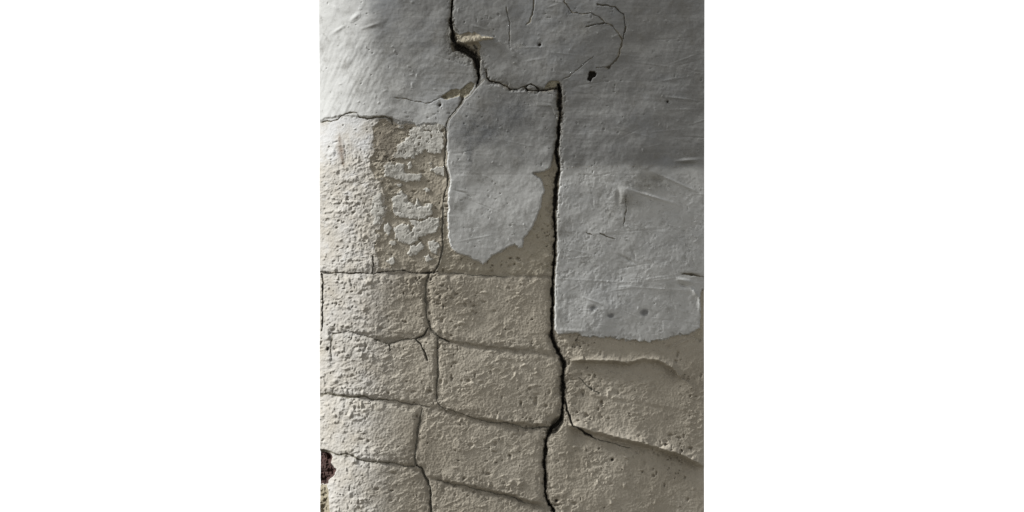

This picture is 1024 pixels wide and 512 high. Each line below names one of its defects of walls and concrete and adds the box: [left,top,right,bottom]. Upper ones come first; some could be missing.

peeling [370,119,558,277]
crack [320,0,630,512]
flaking render [690,290,704,341]
spalling [320,452,336,512]